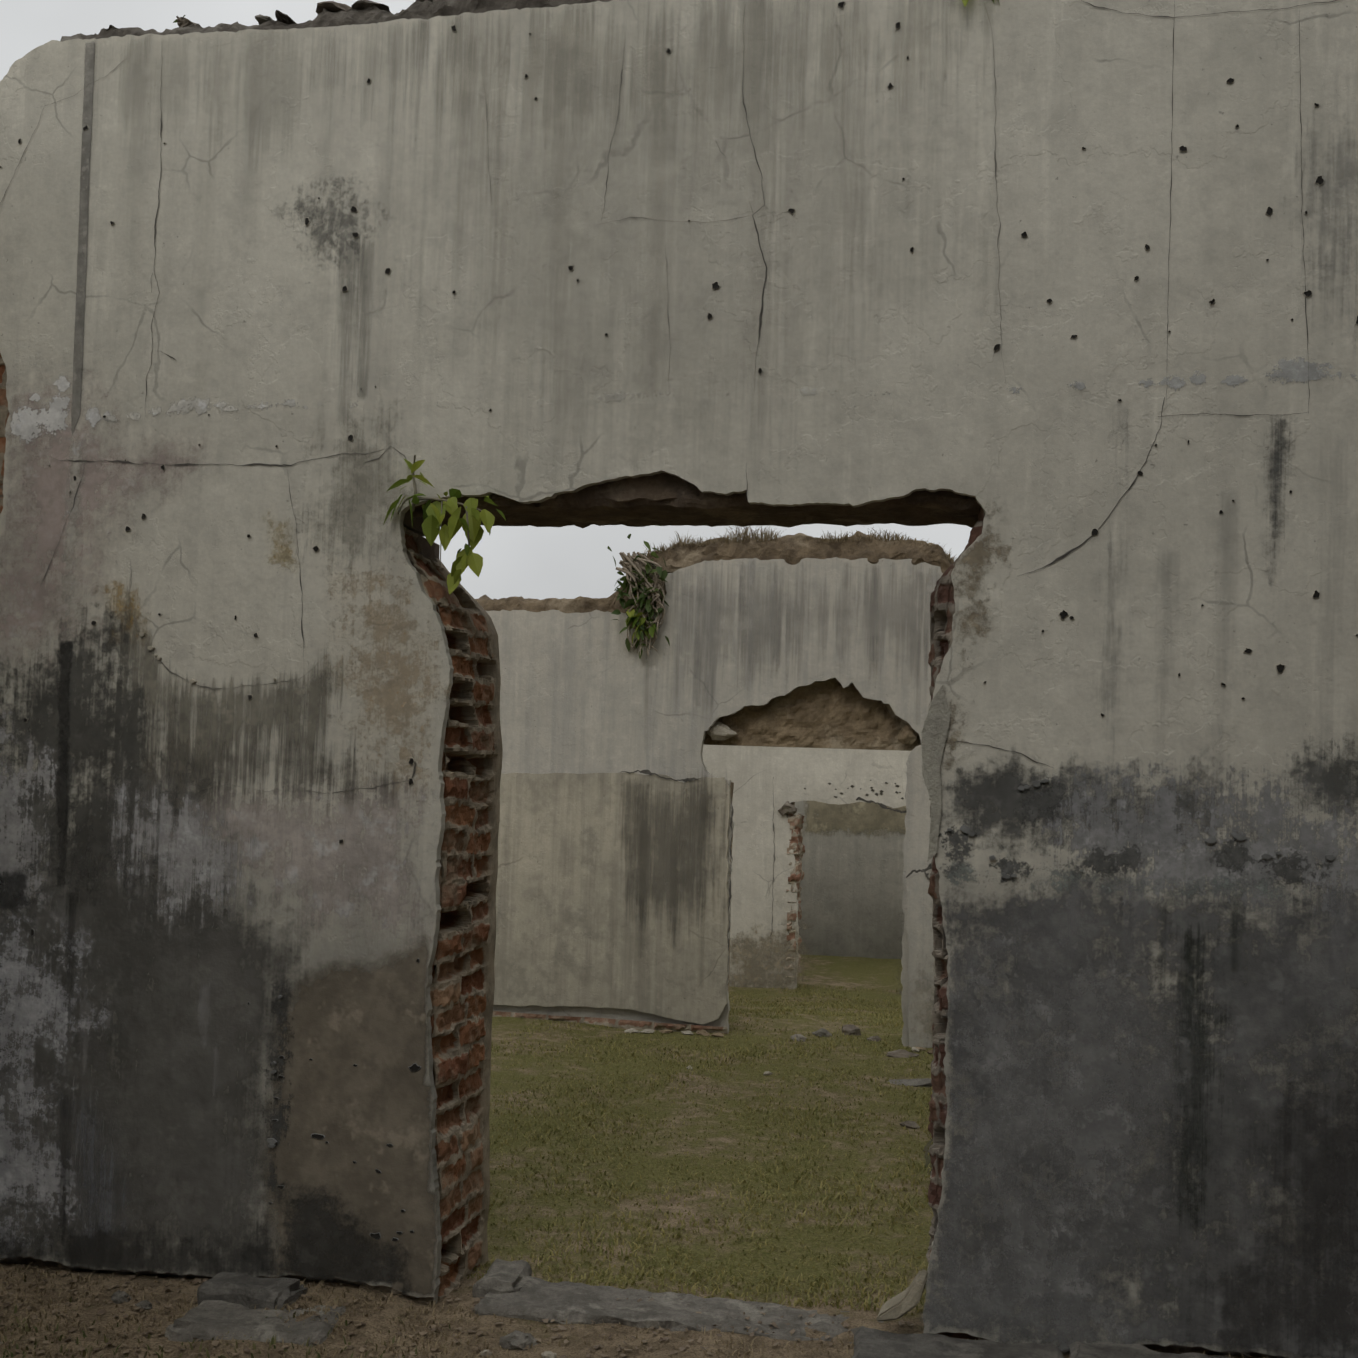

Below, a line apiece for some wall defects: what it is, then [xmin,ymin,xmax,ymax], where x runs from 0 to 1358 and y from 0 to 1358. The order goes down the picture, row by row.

spalling [0,353,10,514]
water stain [0,611,437,1296]
crack [29,446,415,690]
spalling [391,527,503,1302]
crack [598,8,767,390]
spalling [704,678,921,751]
crack [906,863,932,880]
spalling [926,821,977,1263]
spalling [928,507,986,705]
water stain [954,533,1010,636]
water stain [926,705,1358,1358]
crack [1020,0,1337,576]